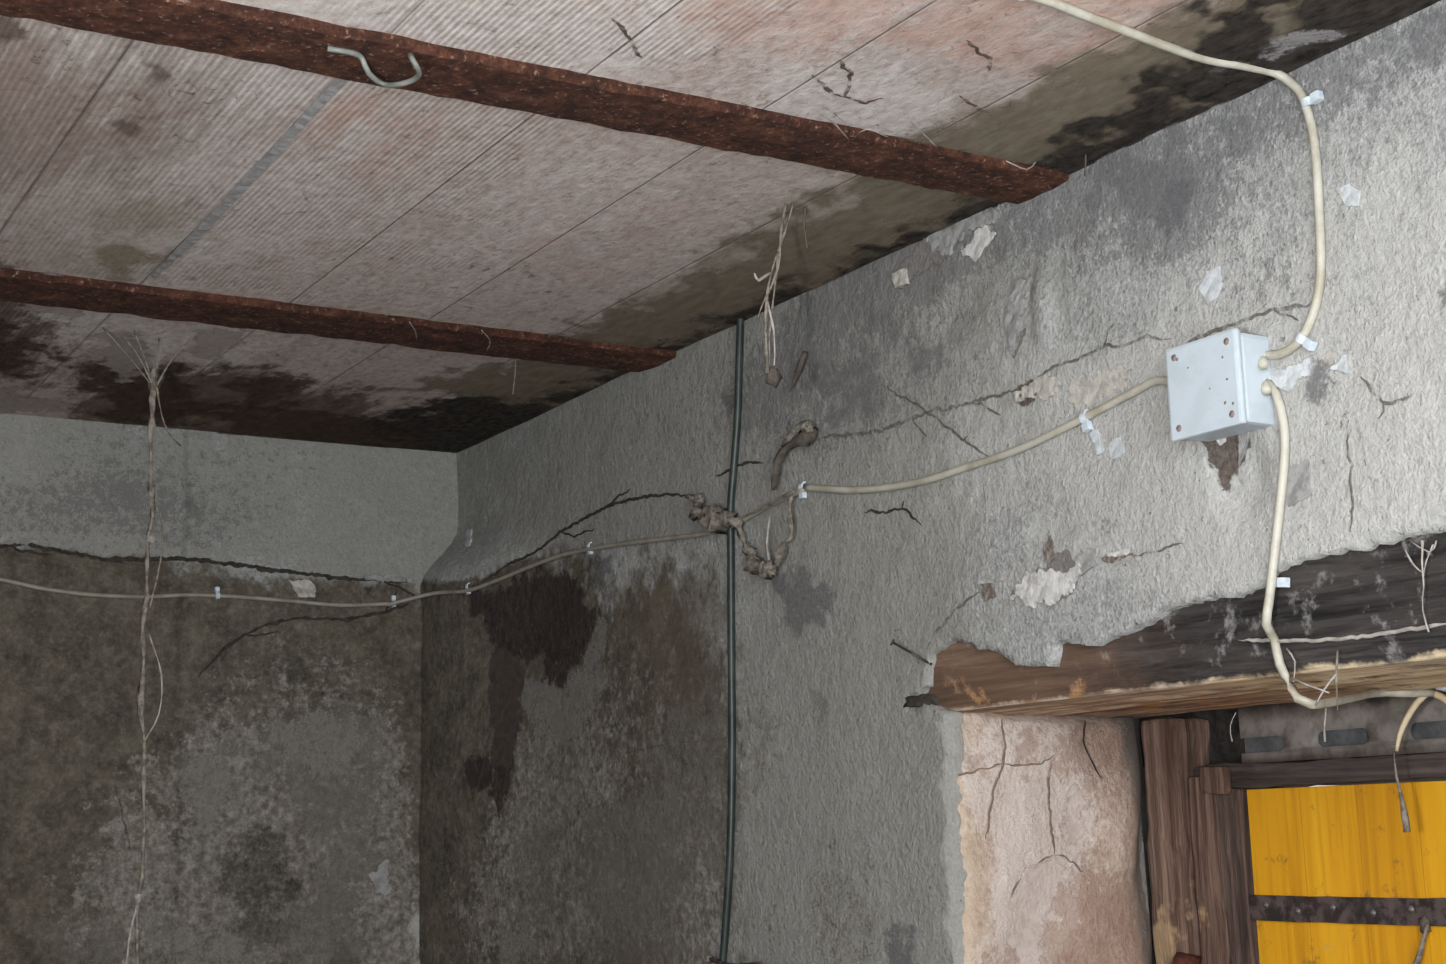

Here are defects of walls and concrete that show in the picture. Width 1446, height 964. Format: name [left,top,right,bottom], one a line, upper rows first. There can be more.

crack [812,63,883,104]
leakage [908,0,1441,175]
leakage [97,245,166,282]
leakage [556,176,1005,351]
leakage [0,303,629,453]
crack [824,303,1309,456]
spalling [1201,432,1251,490]
spalling [978,535,1135,608]
leakage [463,554,612,814]
crack [957,719,1102,900]